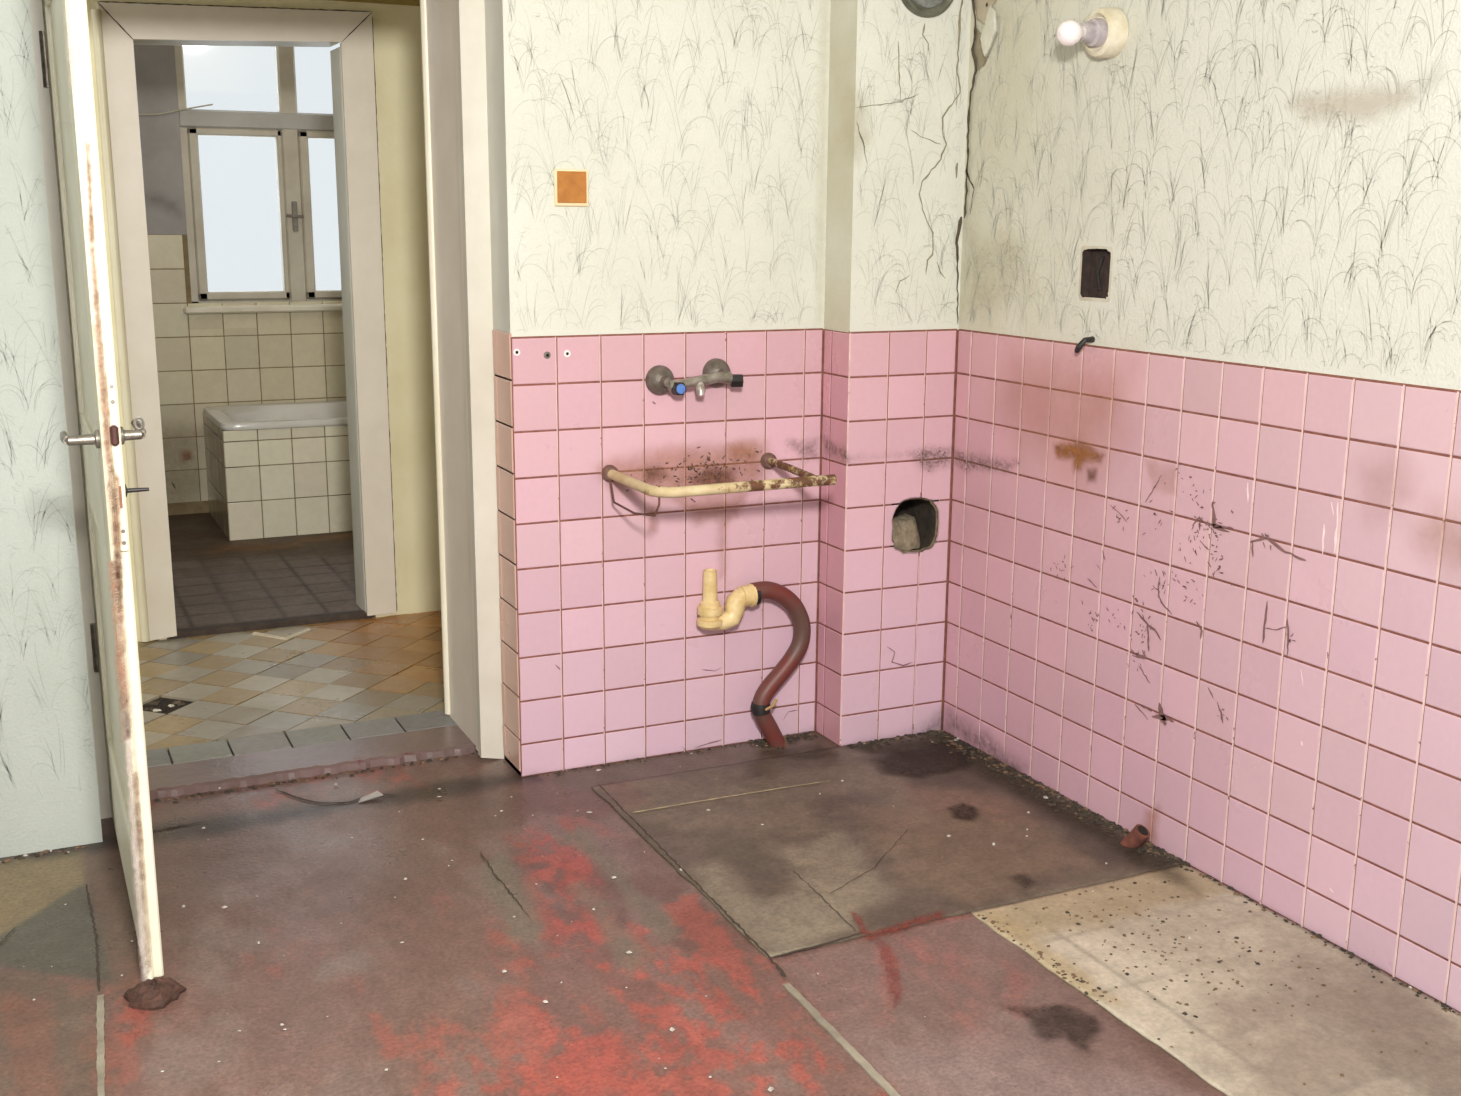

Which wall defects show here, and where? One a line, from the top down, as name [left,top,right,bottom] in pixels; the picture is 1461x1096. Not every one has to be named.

peeling [974,3,997,69]
crack [856,0,978,324]
corrosion [626,447,762,502]
corrosion [1056,445,1100,479]
damp [878,734,969,776]
damp [1014,1005,1097,1046]